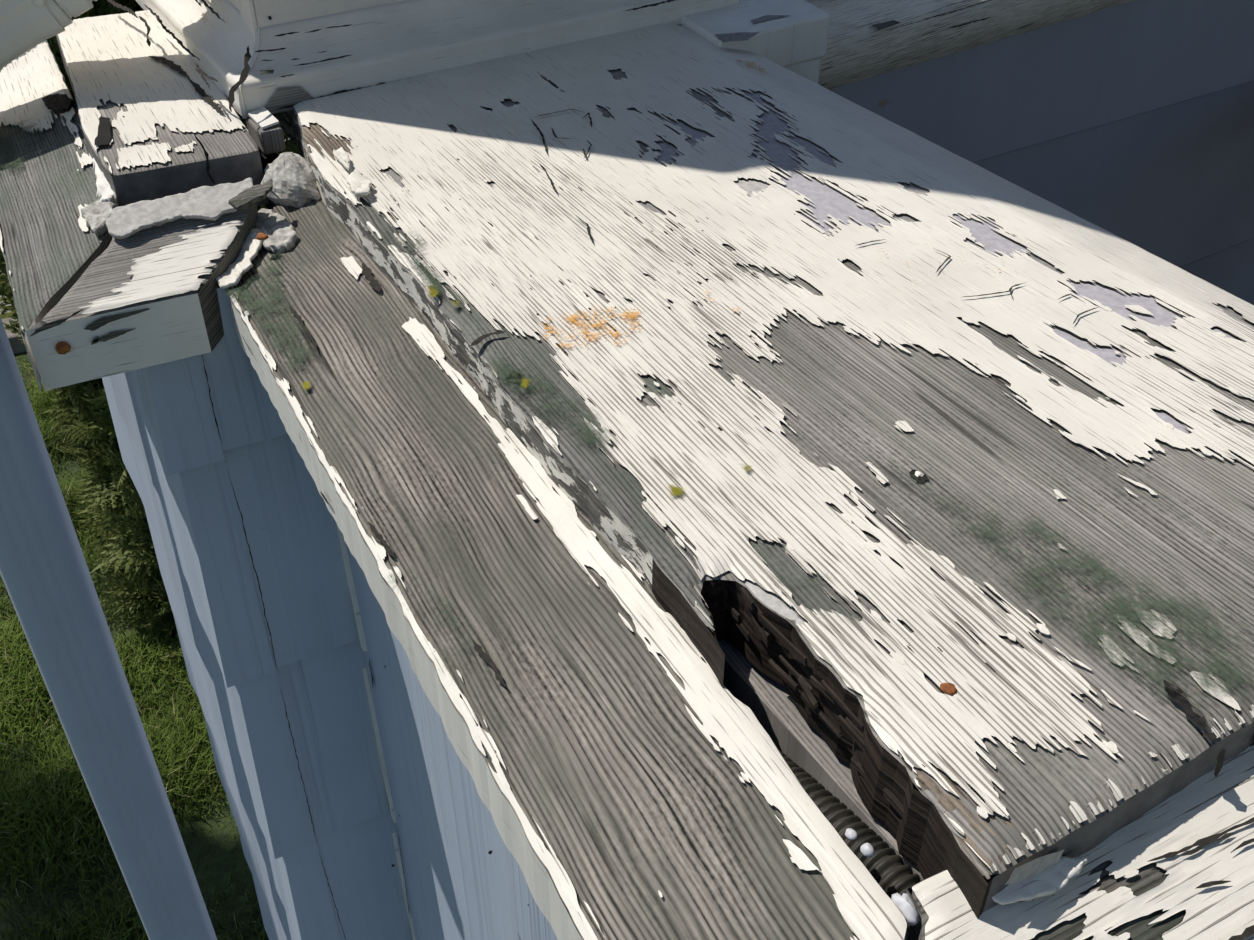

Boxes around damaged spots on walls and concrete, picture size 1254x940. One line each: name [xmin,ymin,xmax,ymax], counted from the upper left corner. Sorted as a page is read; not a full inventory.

crack [107,0,399,114]
peeling [97,102,258,175]
crack [194,135,216,185]
peeling [302,124,351,161]
peeling [718,241,822,296]
rust [544,307,641,348]
peeling [953,212,1254,432]
peeling [348,199,714,633]
peeling [708,311,1254,885]
peeling [1079,862,1167,896]
peeling [1032,914,1091,940]
peeling [1106,911,1184,940]